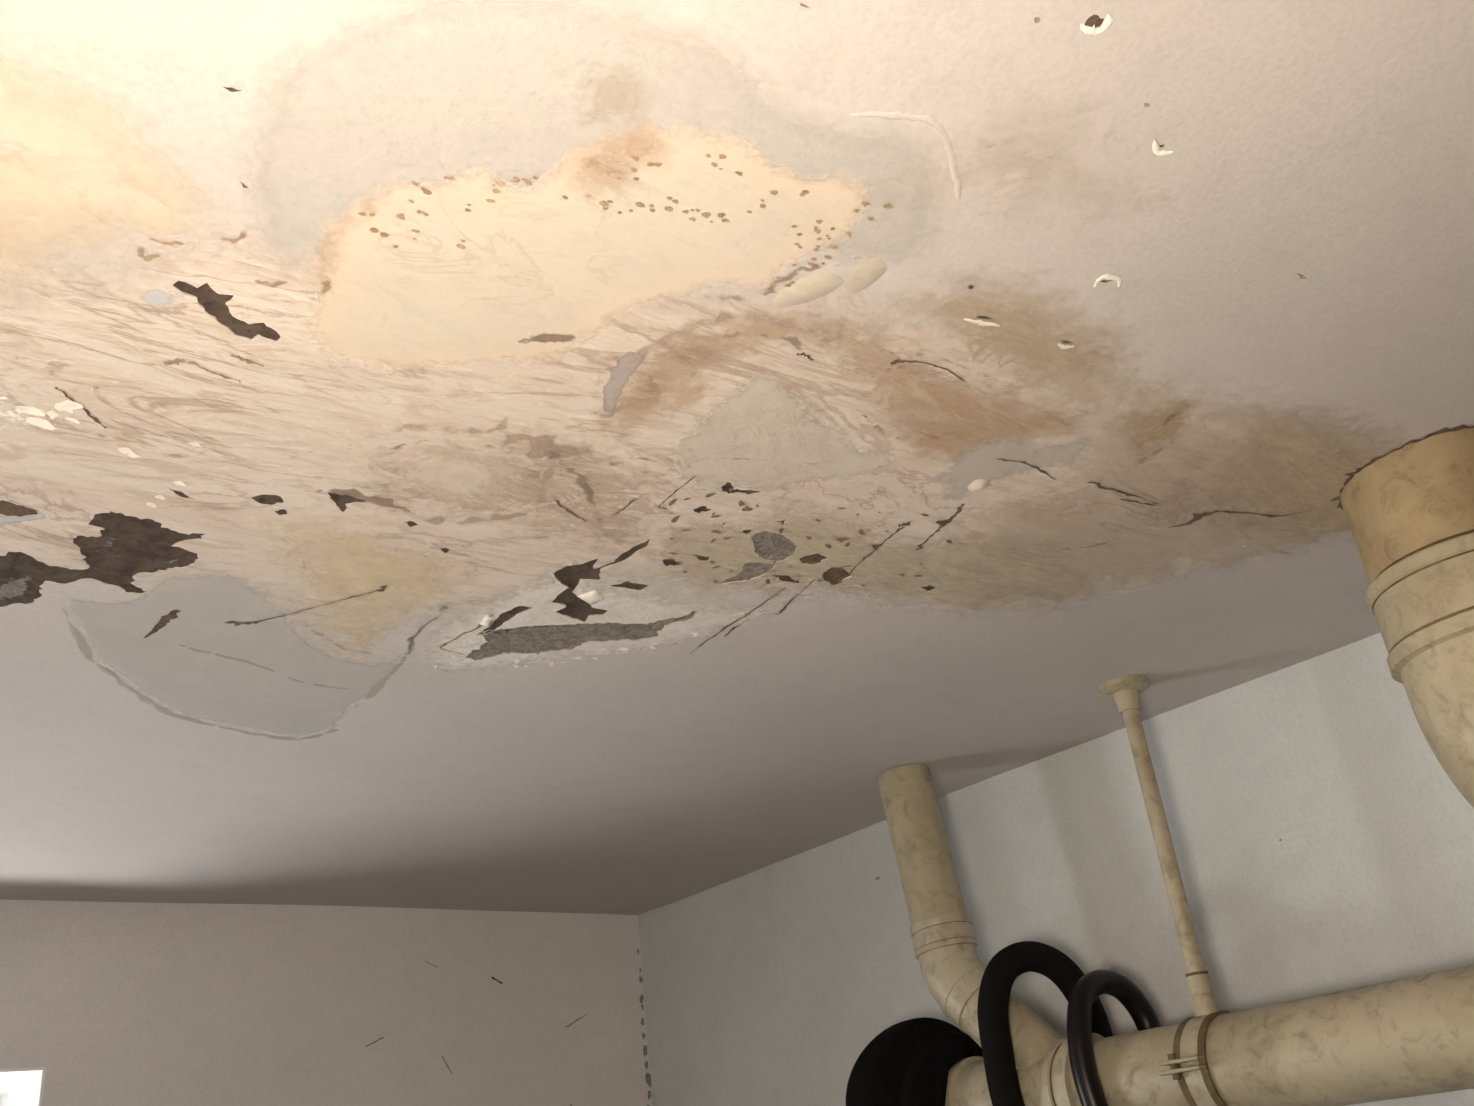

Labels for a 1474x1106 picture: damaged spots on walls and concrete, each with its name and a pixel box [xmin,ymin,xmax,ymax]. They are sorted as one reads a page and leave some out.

spalling [1080,13,1114,36]
peeling [309,127,865,366]
spalling [143,281,280,342]
damp [0,2,1383,661]
peeling [0,388,83,431]
peeling [117,448,141,458]
spalling [722,482,760,495]
crack [997,425,1474,528]
spalling [717,520,851,586]
peeling [0,481,414,741]
peeling [431,539,763,668]